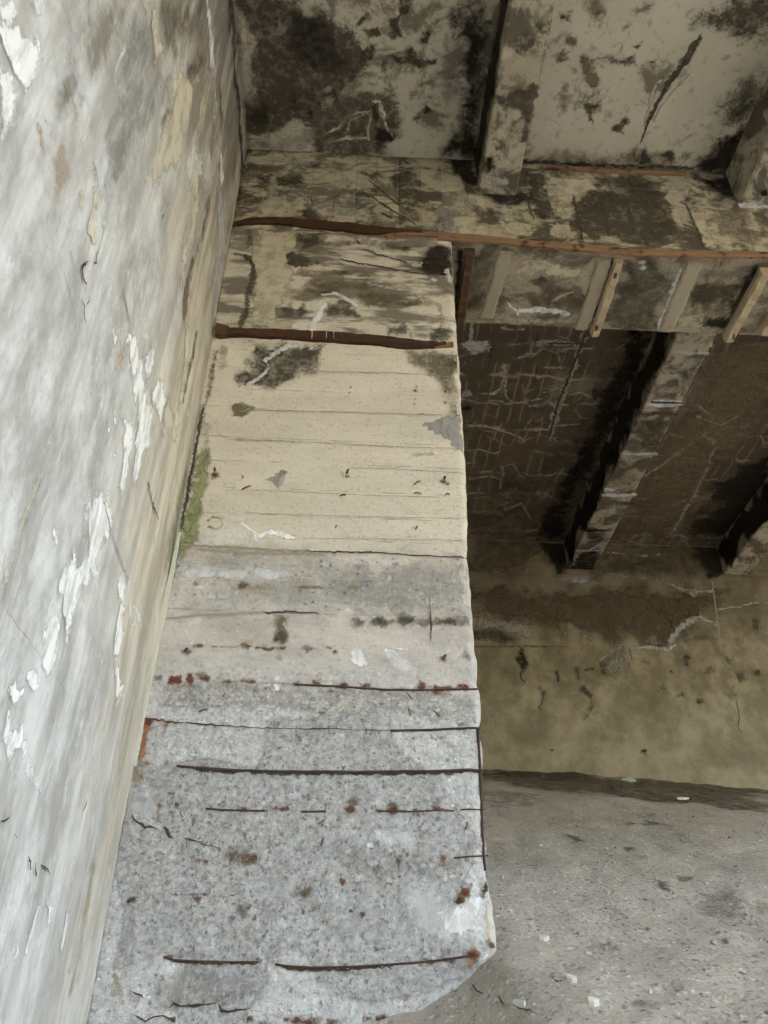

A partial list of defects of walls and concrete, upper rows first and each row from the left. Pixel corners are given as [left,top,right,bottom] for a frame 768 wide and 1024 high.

peeling [148,68,211,184]
damp [228,0,436,188]
crack [640,35,702,143]
rust [235,217,768,259]
damp [484,150,675,245]
damp [236,340,322,390]
rust [215,323,454,350]
damp [2,139,257,793]
damp [399,341,768,719]
rust [168,673,210,685]
spalling [113,677,488,1024]
rust [454,882,488,904]